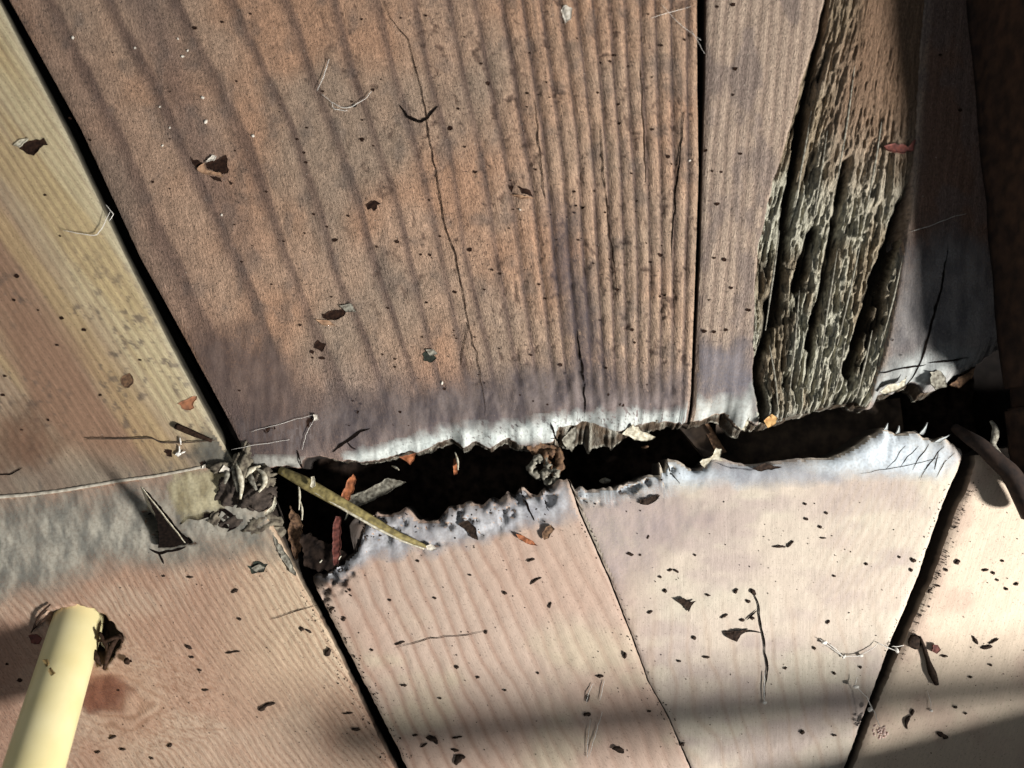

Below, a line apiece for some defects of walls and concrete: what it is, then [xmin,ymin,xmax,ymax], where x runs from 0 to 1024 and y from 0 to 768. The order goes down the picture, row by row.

crack [384,3,485,402]
peeling [880,376,907,394]
peeling [929,368,975,390]
peeling [562,426,577,452]
peeling [622,424,655,441]
peeling [700,448,723,469]
leakage [0,485,269,599]
peeling [273,505,354,576]